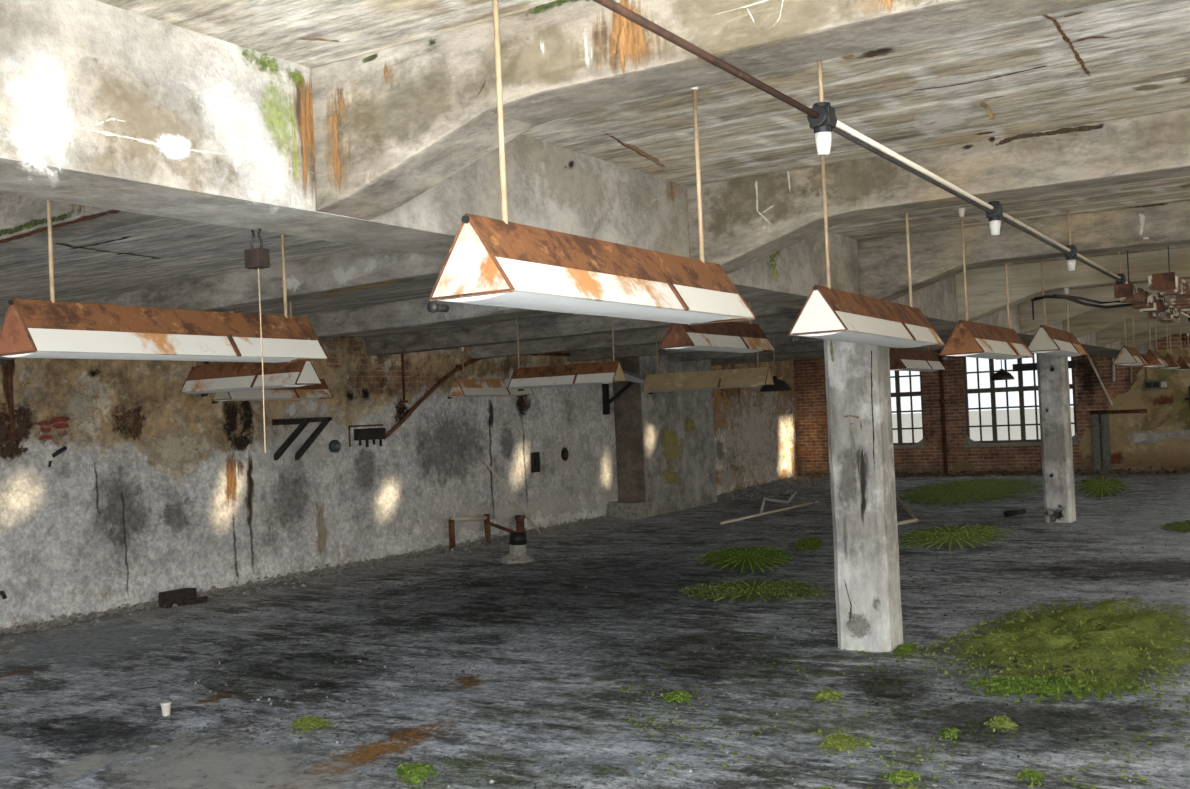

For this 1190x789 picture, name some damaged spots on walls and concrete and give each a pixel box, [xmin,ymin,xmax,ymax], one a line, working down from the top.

corrosion [610,0,649,69]
crack [1042,12,1111,77]
crack [915,65,1047,99]
corrosion [299,85,315,192]
corrosion [332,94,344,188]
flaking render [35,414,70,445]
peeling [251,400,349,470]
corrosion [225,454,254,525]
water stain [839,448,866,521]